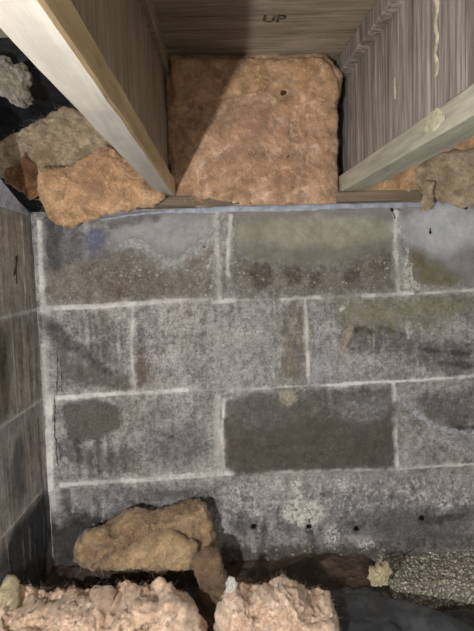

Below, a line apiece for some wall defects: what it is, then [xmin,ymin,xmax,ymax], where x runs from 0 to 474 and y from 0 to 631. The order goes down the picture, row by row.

water stain [44,217,106,268]
water stain [402,247,460,291]
water stain [340,300,474,375]
water stain [59,401,136,469]
water stain [217,388,474,543]
water stain [324,524,340,547]